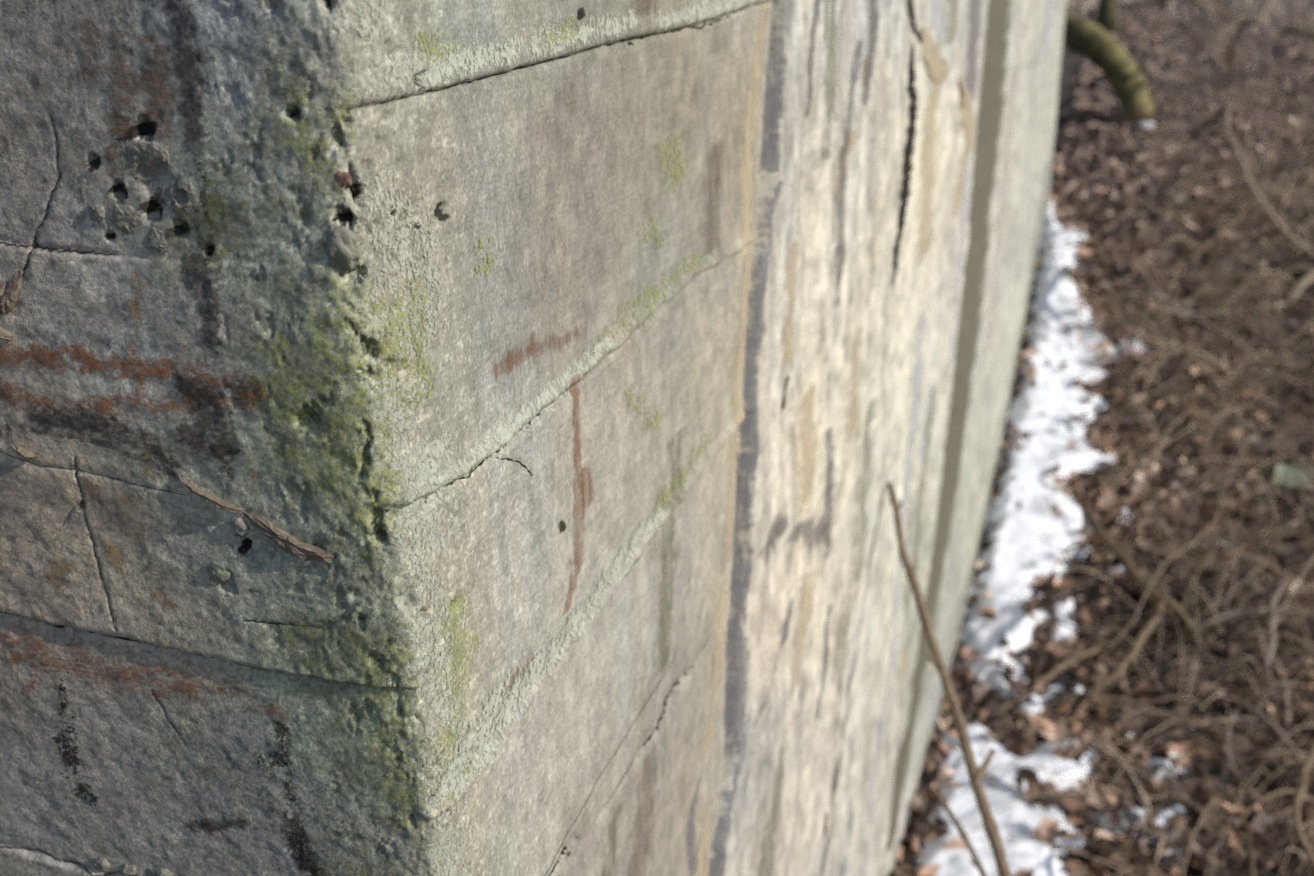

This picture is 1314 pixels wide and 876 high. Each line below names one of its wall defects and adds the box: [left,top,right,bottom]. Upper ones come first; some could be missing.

water stain [0,0,256,494]
water stain [434,201,450,221]
rust [0,338,271,417]
rust [569,375,592,518]
water stain [0,461,153,570]
rust [565,535,583,610]
crack [243,620,321,628]
crack [0,846,133,876]
water stain [185,817,250,834]
water stain [258,721,322,876]